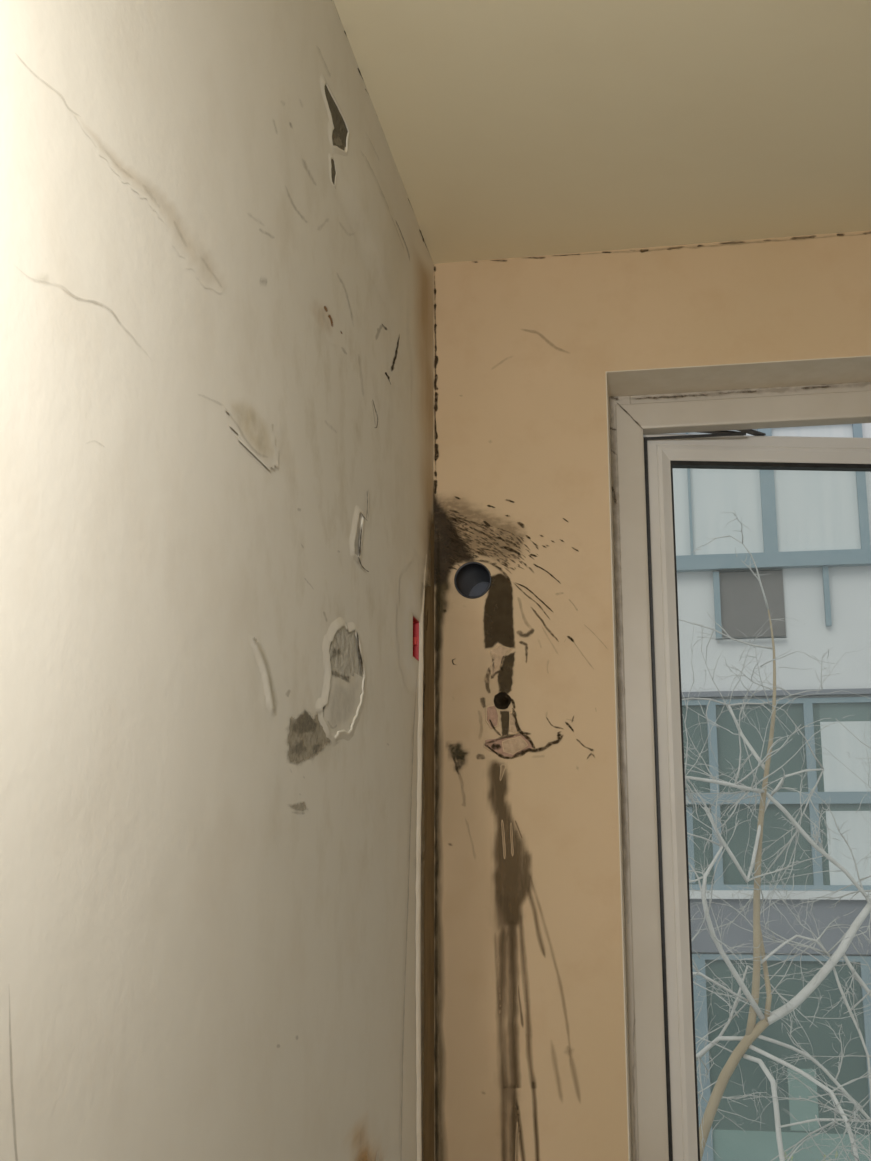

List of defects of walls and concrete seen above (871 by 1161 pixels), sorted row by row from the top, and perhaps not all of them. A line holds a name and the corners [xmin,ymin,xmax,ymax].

crack [74,113,228,294]
spalling [319,73,351,190]
spalling [288,617,368,763]
damp [434,496,578,1161]
rust [340,1097,389,1161]